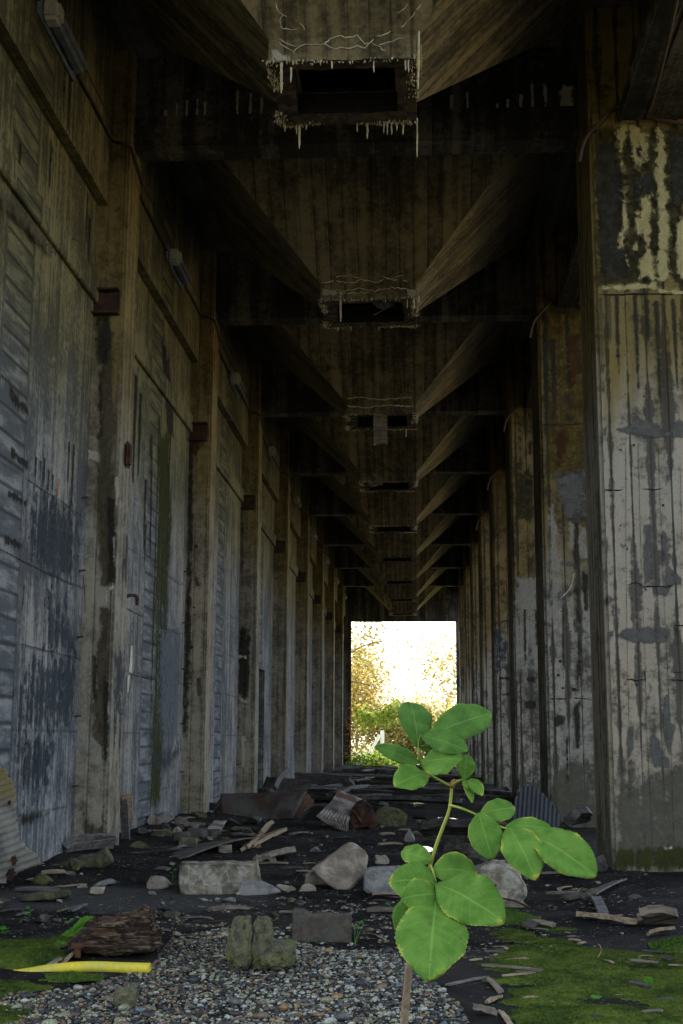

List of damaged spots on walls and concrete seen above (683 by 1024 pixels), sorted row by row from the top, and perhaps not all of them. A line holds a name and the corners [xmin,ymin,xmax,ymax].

water stain [236,31,423,149]
water stain [356,118,418,158]
peeling [602,124,683,306]
water stain [318,288,420,331]
water stain [10,388,28,415]
water stain [5,441,81,825]
water stain [91,332,128,760]
water stain [133,375,202,773]